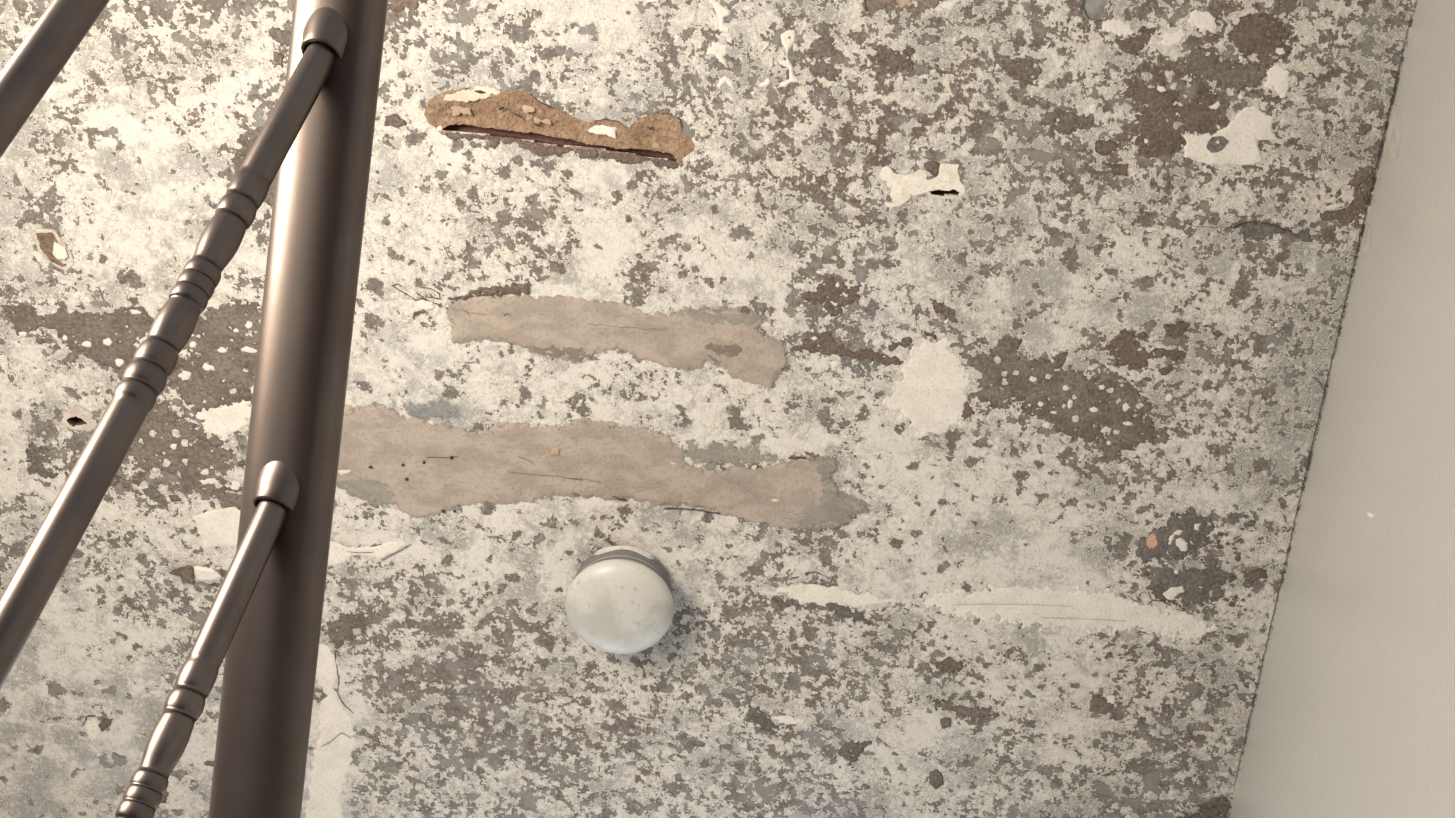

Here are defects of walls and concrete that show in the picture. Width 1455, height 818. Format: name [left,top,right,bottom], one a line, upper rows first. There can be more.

peeling [387,0,426,15]
peeling [265,26,291,68]
peeling [384,114,406,127]
flaking render [424,85,694,169]
flaking render [1176,793,1233,818]